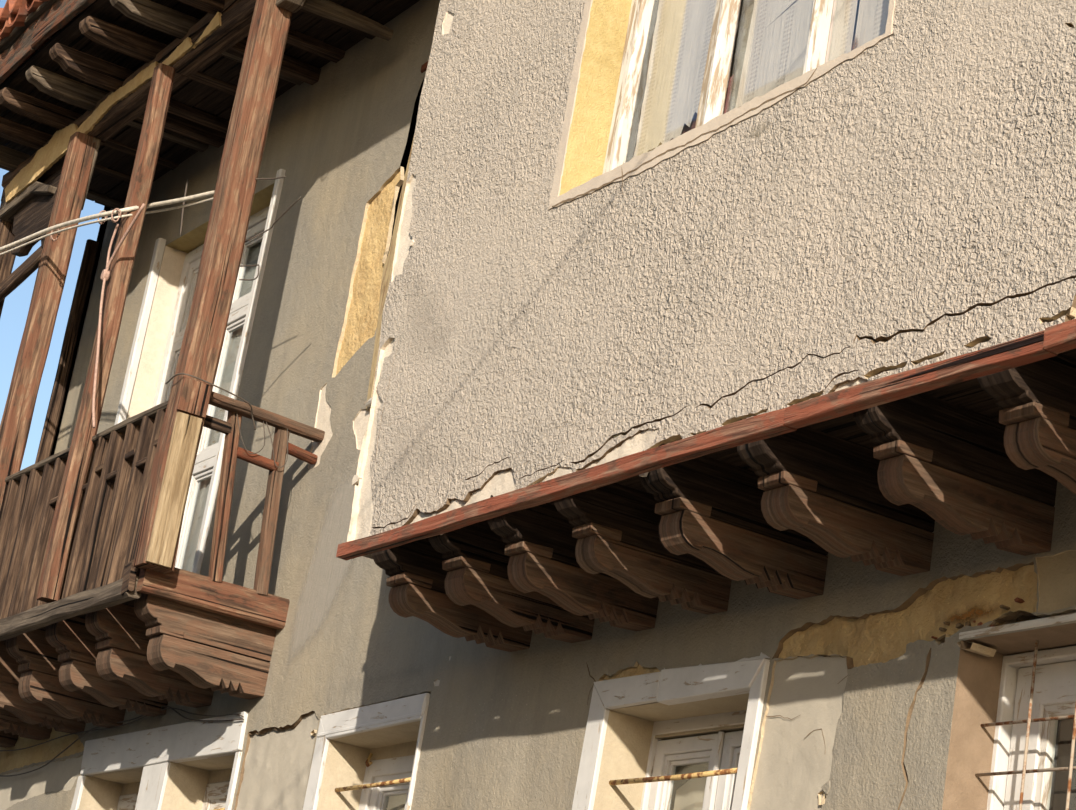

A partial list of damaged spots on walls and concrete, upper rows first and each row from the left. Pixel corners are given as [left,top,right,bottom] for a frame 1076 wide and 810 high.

flaking render [308,166,416,470]
flaking render [347,337,395,542]
crack [372,505,416,529]
crack [465,275,1076,480]
crack [249,711,315,735]
flaking render [747,550,1076,810]
crack [898,648,931,810]